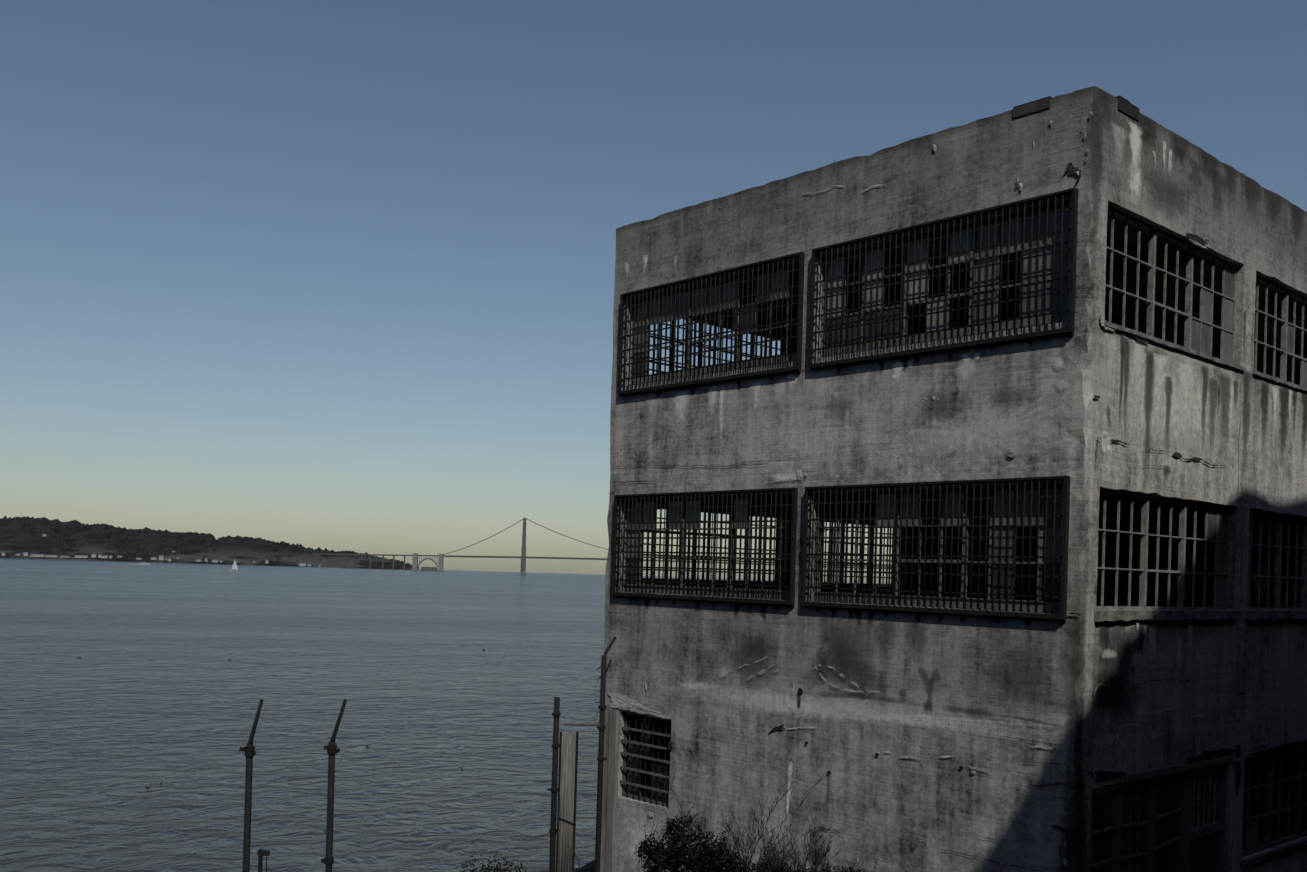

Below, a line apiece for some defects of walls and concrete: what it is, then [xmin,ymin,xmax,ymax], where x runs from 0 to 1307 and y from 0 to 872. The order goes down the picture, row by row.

water stain [1093,94,1186,210]
water stain [1204,154,1302,226]
water stain [1105,334,1307,493]
water stain [682,611,1204,872]